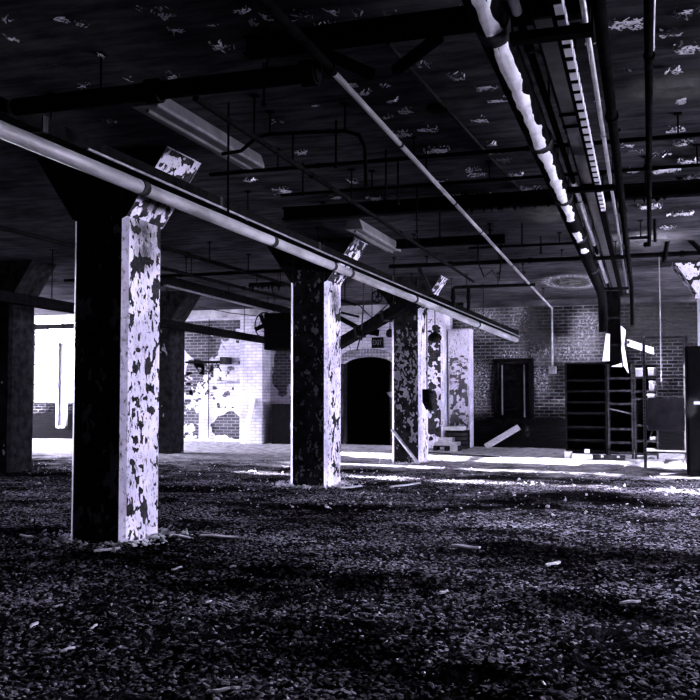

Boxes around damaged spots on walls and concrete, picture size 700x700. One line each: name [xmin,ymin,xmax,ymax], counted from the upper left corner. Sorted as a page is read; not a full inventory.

peeling [607,17,643,31]
peeling [659,27,700,55]
peeling [652,158,700,180]
peeling [149,206,171,250]
peeling [129,250,154,307]
peeling [672,262,700,300]
peeling [144,274,167,395]
peeling [184,320,240,439]
peeling [421,306,441,441]
peeling [450,372,468,430]
peeling [315,412,340,477]
peeling [126,486,150,526]